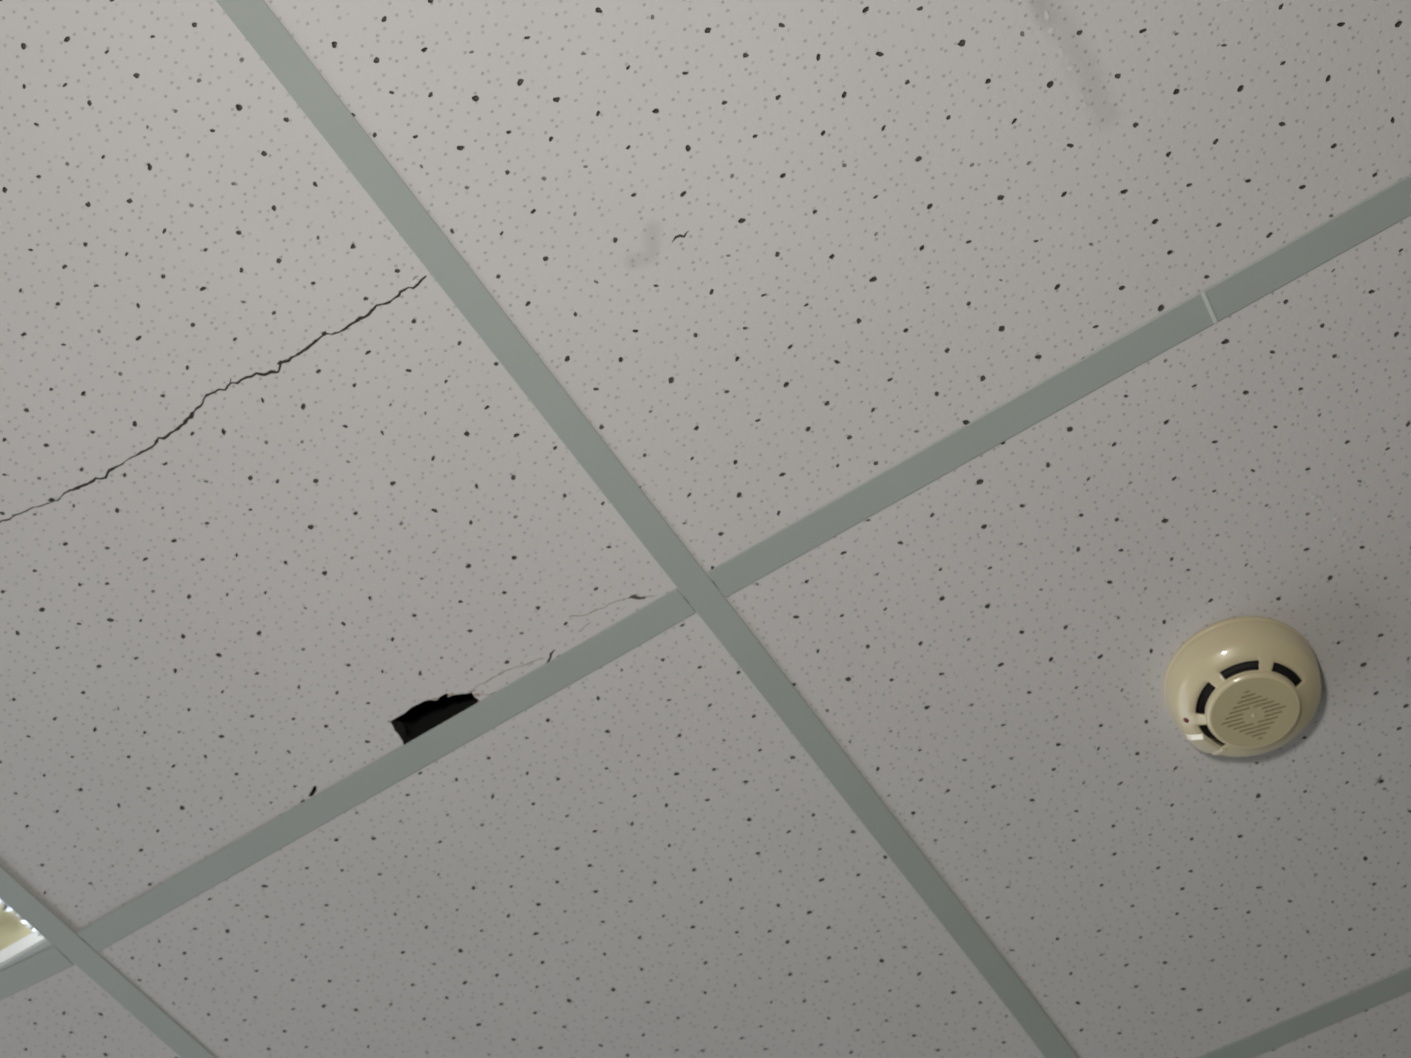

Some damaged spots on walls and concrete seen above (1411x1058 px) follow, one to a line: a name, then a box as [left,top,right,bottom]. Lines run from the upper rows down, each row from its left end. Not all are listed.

crack [0,275,427,523]
spalling [387,690,480,745]